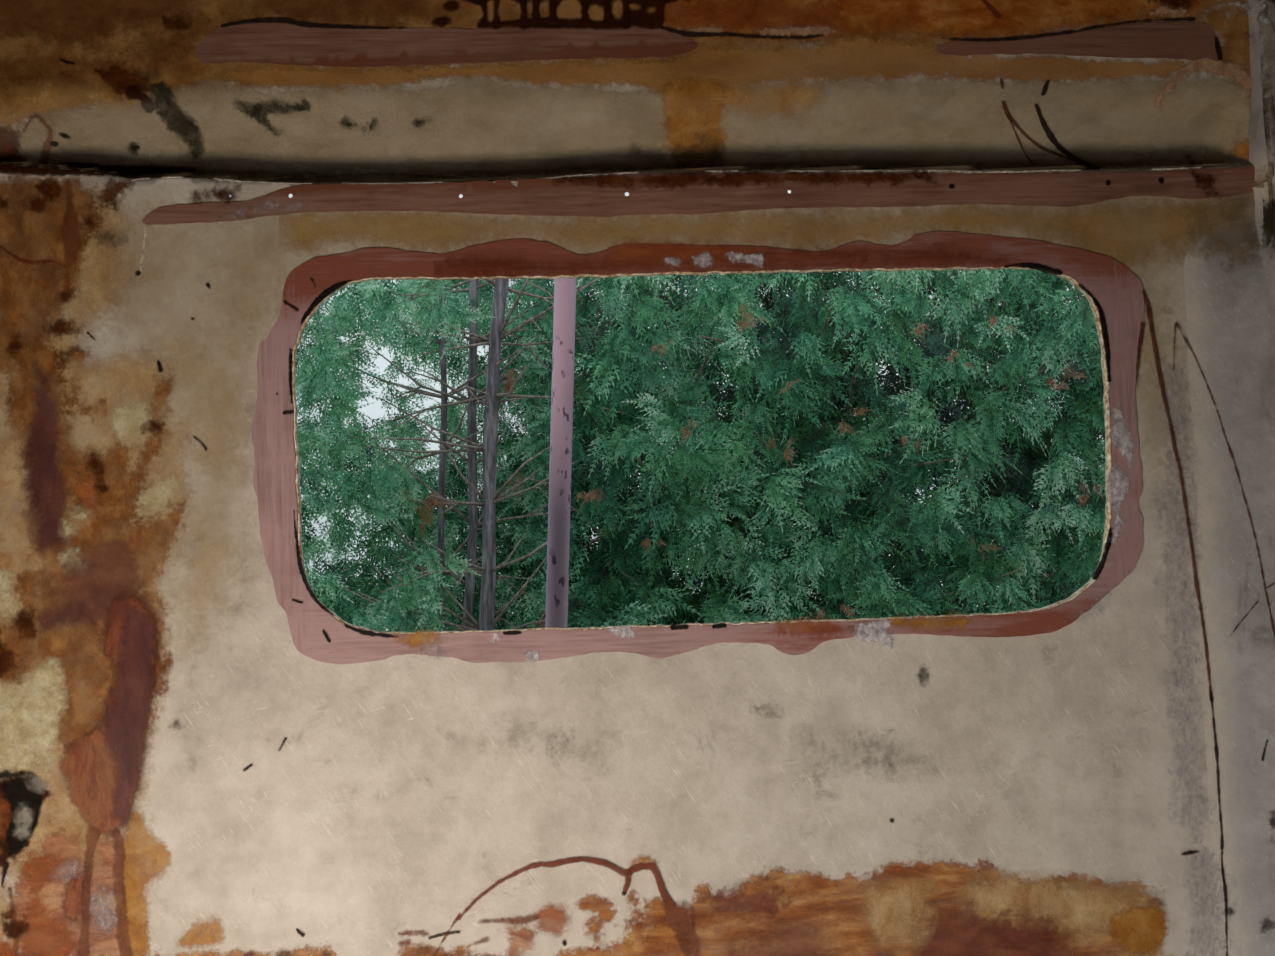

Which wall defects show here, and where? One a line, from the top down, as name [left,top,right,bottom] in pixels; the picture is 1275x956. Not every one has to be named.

water stain [0,0,1251,181]
crack [1000,79,1101,169]
rust [557,167,936,189]
water stain [1262,202,1275,245]
water stain [22,194,235,667]
rust [0,115,184,956]
water stain [0,359,170,956]
crack [1136,290,1275,956]
spalling [0,770,49,867]
rust [176,946,336,956]
rust [399,931,493,956]
rust [481,860,1166,956]